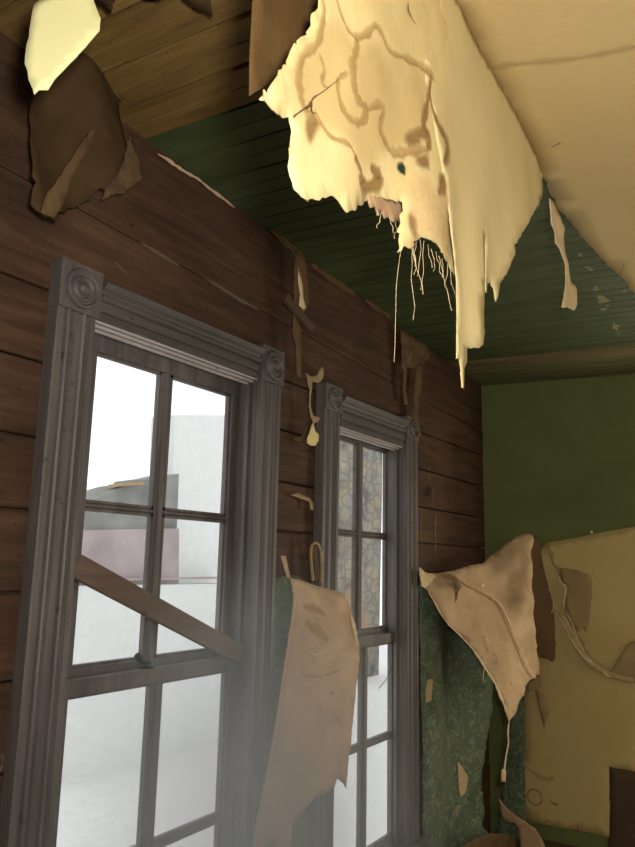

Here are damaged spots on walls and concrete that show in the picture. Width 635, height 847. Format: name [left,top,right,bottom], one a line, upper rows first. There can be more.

damp [299,3,383,194]
damp [336,2,449,167]
peeling [252,578,360,847]
peeling [419,533,635,782]
peeling [608,766,635,847]